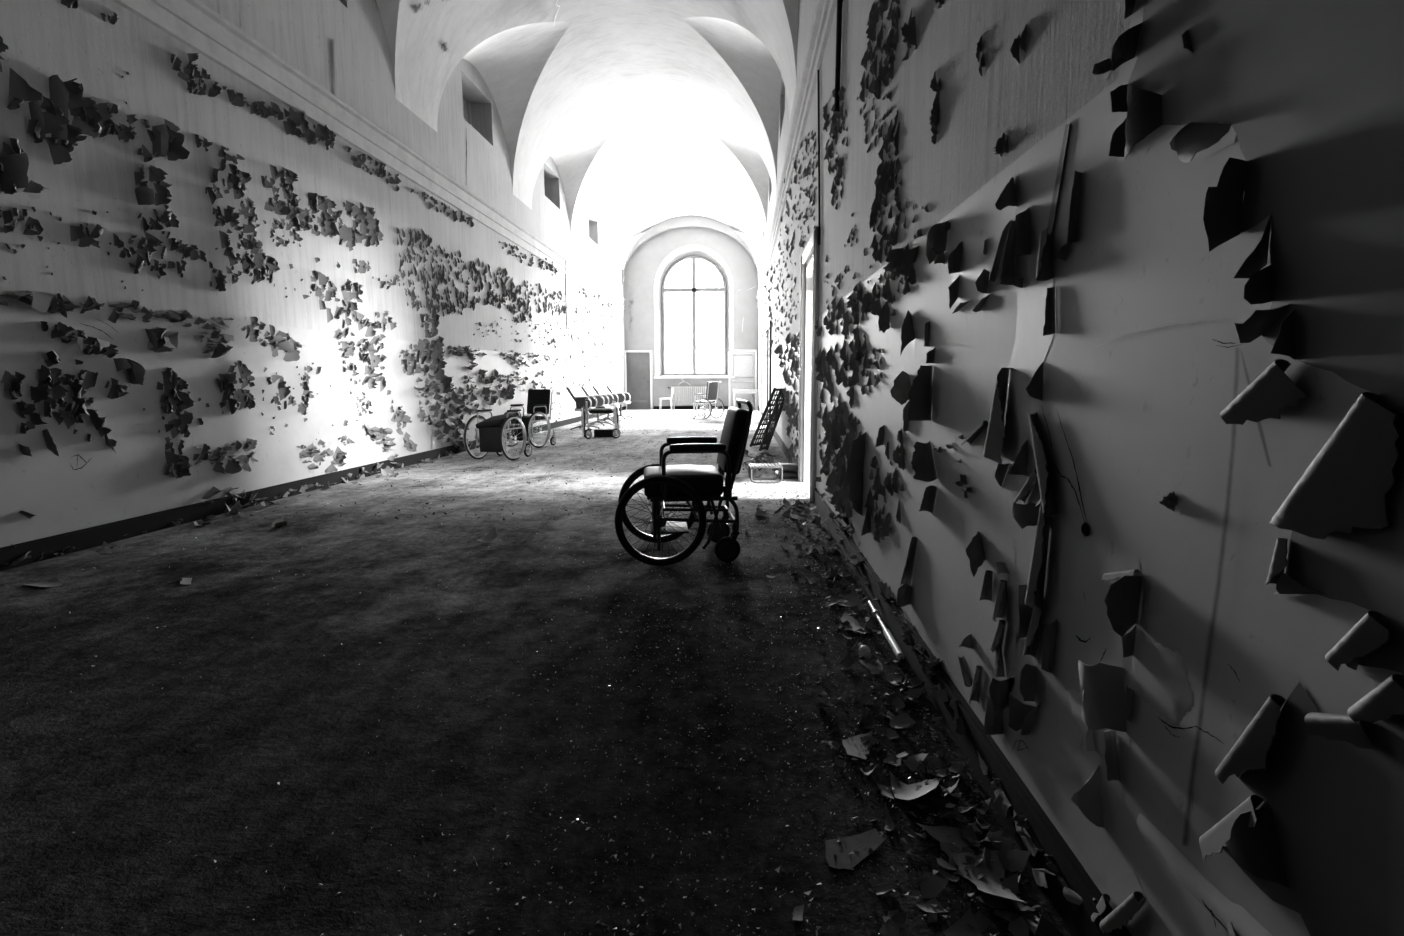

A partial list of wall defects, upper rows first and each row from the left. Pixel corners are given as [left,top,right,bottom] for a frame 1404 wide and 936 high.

peeling [755,0,1145,936]
peeling [1092,0,1404,936]